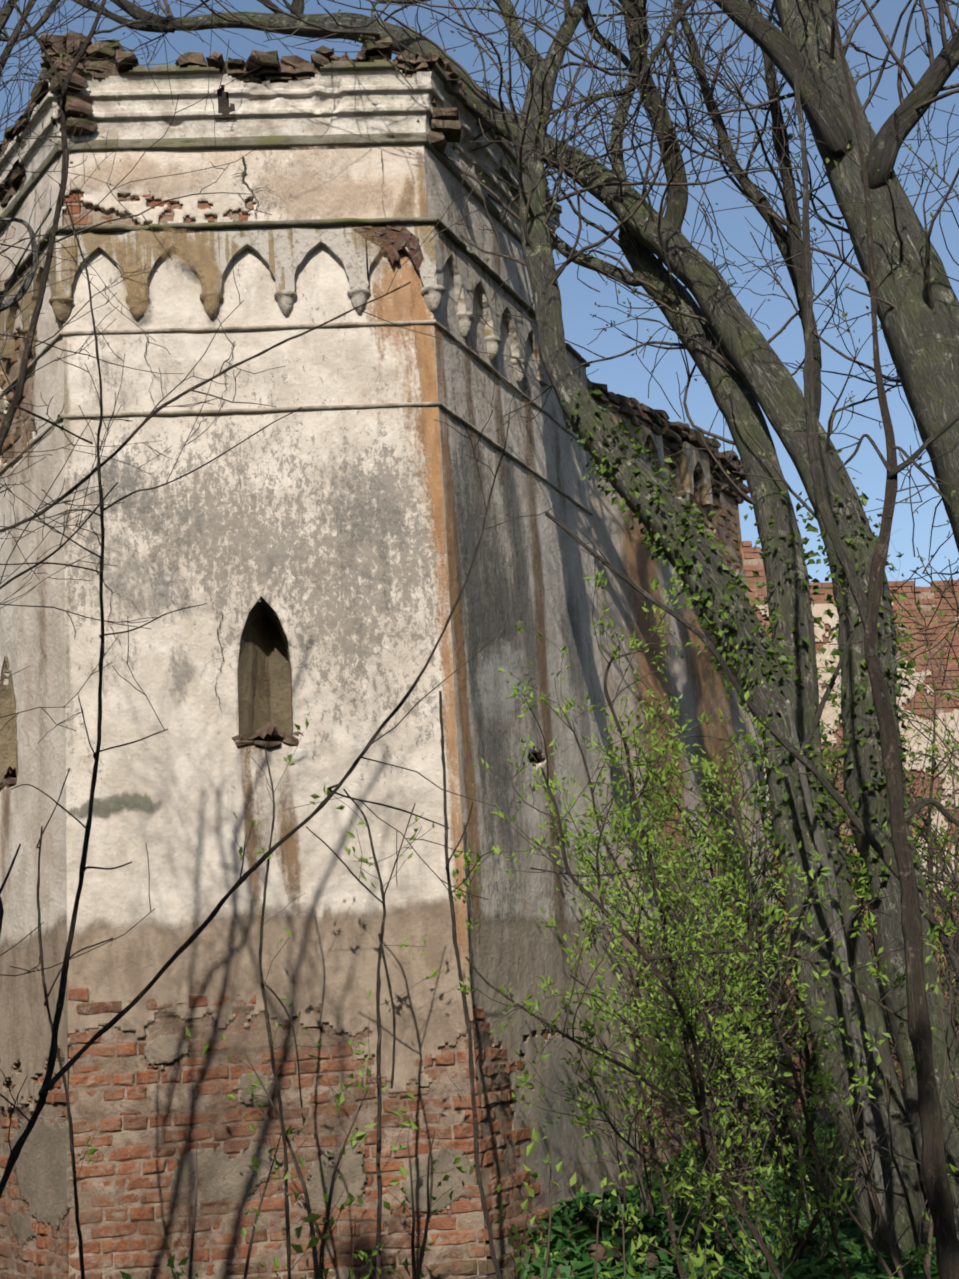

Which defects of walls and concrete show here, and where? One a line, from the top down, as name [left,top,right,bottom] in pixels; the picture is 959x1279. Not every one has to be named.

spalling [63,190,255,226]
spalling [353,152,427,270]
rust [370,251,480,956]
damp [452,419,542,870]
rust [523,376,565,961]
rust [242,746,262,910]
rust [280,800,300,898]
spalling [0,980,585,1279]
damp [0,899,640,1207]